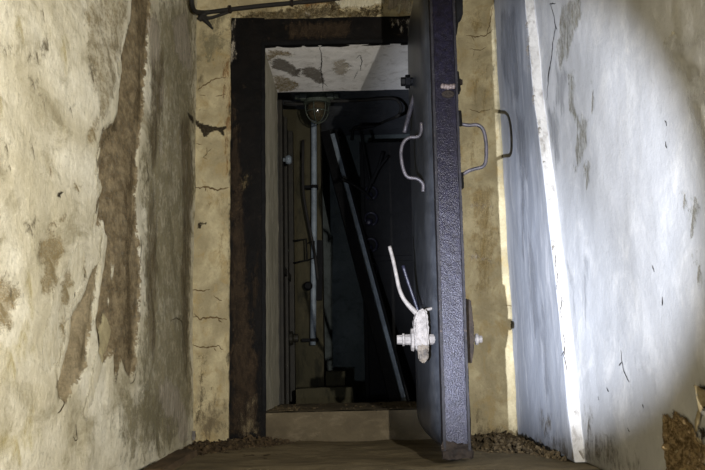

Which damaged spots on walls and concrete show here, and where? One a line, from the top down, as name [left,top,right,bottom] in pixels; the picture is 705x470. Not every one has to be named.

crack [546,3,557,100]
crack [187,112,229,191]
leakage [39,217,75,305]
flaking render [42,0,151,421]
leakage [119,0,230,459]
rust [223,85,259,437]
crack [172,289,227,367]
flaking render [661,384,705,470]